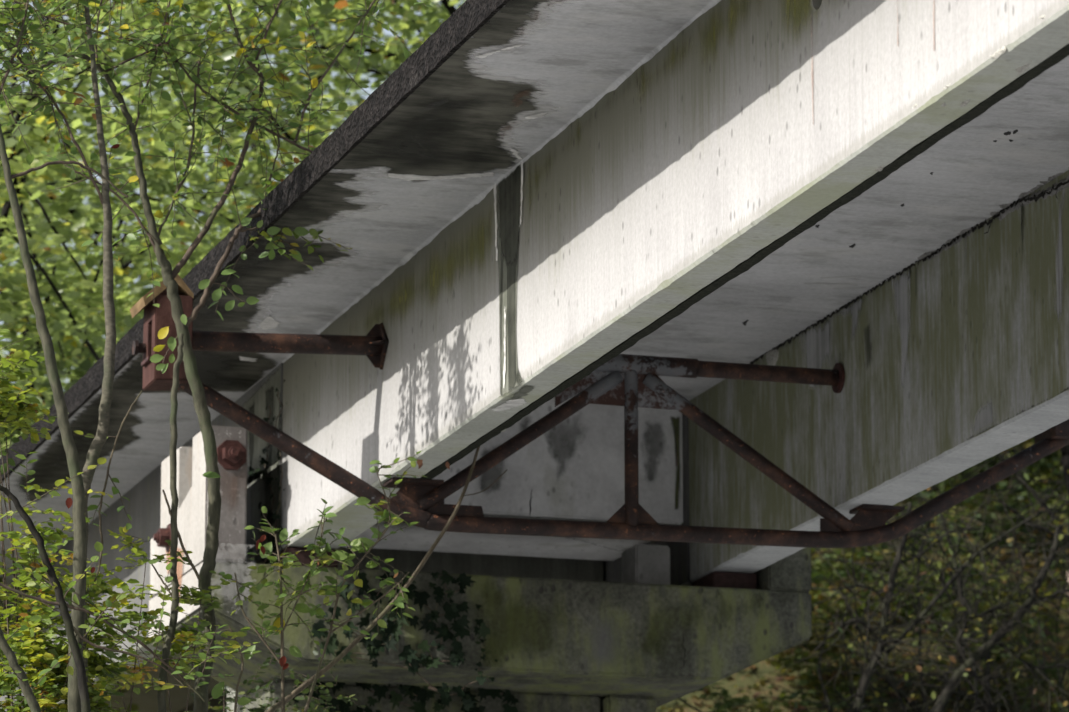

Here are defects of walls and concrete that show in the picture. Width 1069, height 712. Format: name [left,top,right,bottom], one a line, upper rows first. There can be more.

leakage [193,0,558,412]
leakage [20,353,184,502]
leakage [193,351,281,430]
leakage [247,431,280,564]
leakage [549,425,580,473]
leakage [644,425,663,481]
leakage [806,323,829,369]
leakage [892,274,910,384]